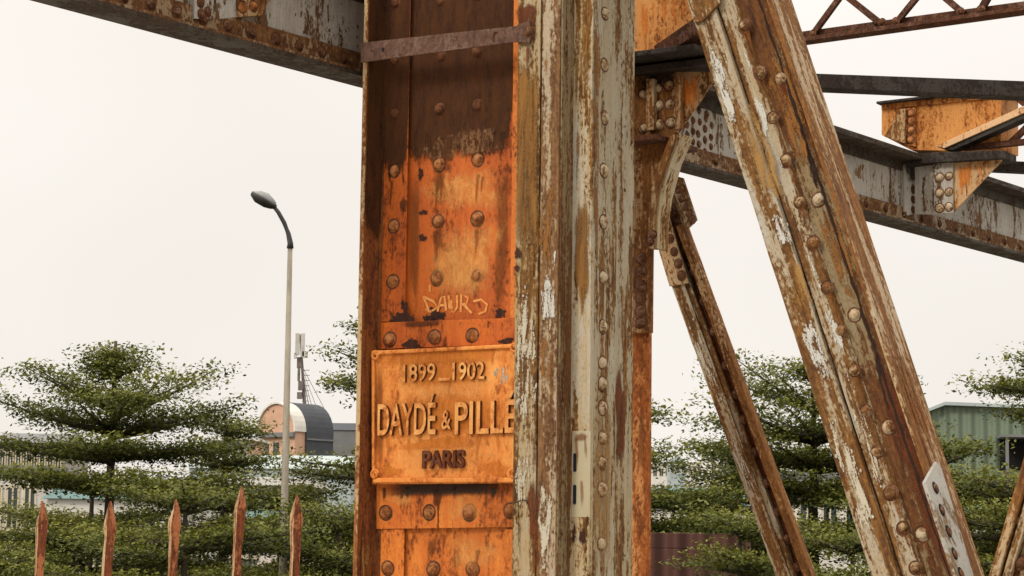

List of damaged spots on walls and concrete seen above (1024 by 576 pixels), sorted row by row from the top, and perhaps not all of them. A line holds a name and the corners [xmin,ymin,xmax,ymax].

peeling [709,45,736,122]
peeling [754,98,783,167]
corrosion [769,57,818,179]
corrosion [390,167,443,290]
peeling [772,214,792,244]
corrosion [788,265,812,306]
corrosion [401,349,494,385]
peeling [689,318,722,402]
corrosion [376,381,488,452]
corrosion [595,286,644,560]
peeling [733,440,755,491]
corrosion [696,283,803,576]